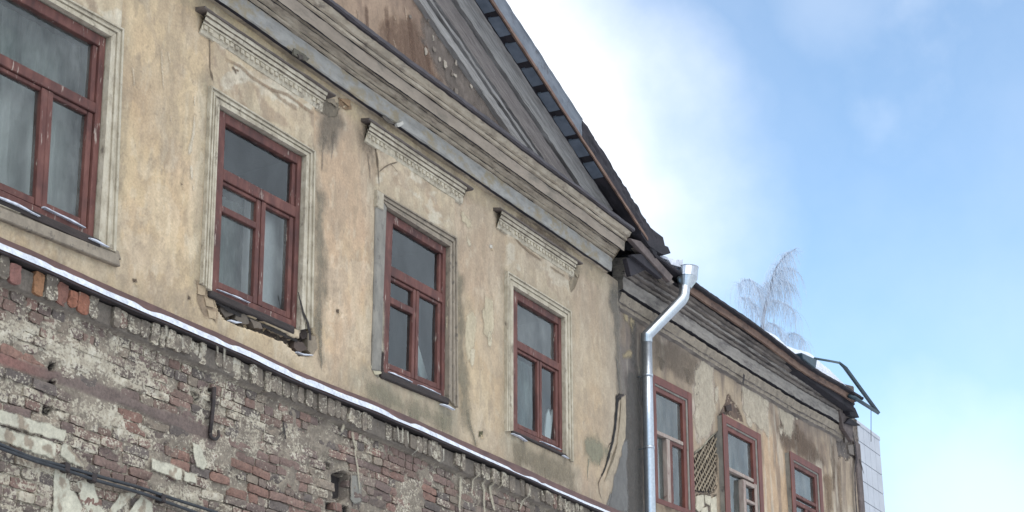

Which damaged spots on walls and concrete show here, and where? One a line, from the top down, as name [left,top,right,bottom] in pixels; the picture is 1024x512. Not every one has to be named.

spalling [188,283,318,355]
spalling [370,301,385,377]
water stain [585,438,606,478]
crack [598,393,626,499]
water stain [607,290,643,512]
peeling [694,361,798,512]